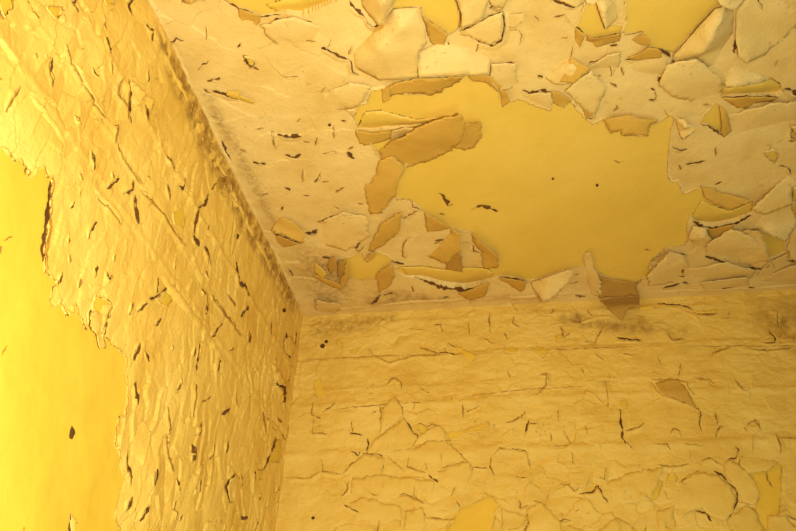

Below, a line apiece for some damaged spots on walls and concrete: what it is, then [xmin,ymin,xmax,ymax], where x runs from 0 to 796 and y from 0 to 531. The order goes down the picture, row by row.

crack [125,0,184,45]
peeling [223,0,328,25]
crack [347,0,379,31]
peeling [312,0,796,321]
crack [671,147,719,170]
peeling [271,217,305,247]
crack [34,17,584,526]
crack [644,249,796,289]
peeling [0,145,130,531]
crack [468,274,796,531]
peeling [445,495,503,531]
peeling [645,455,796,531]